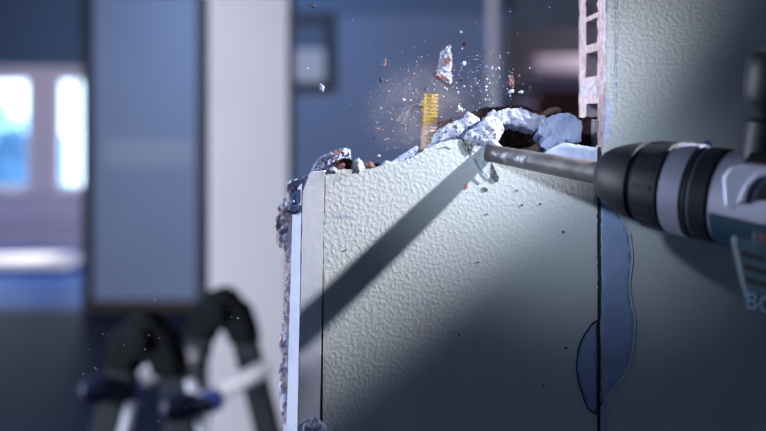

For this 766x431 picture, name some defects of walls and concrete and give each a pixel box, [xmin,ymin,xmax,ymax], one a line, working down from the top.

spalling [461,138,499,191]
peeling [546,144,598,161]
crack [592,196,604,431]